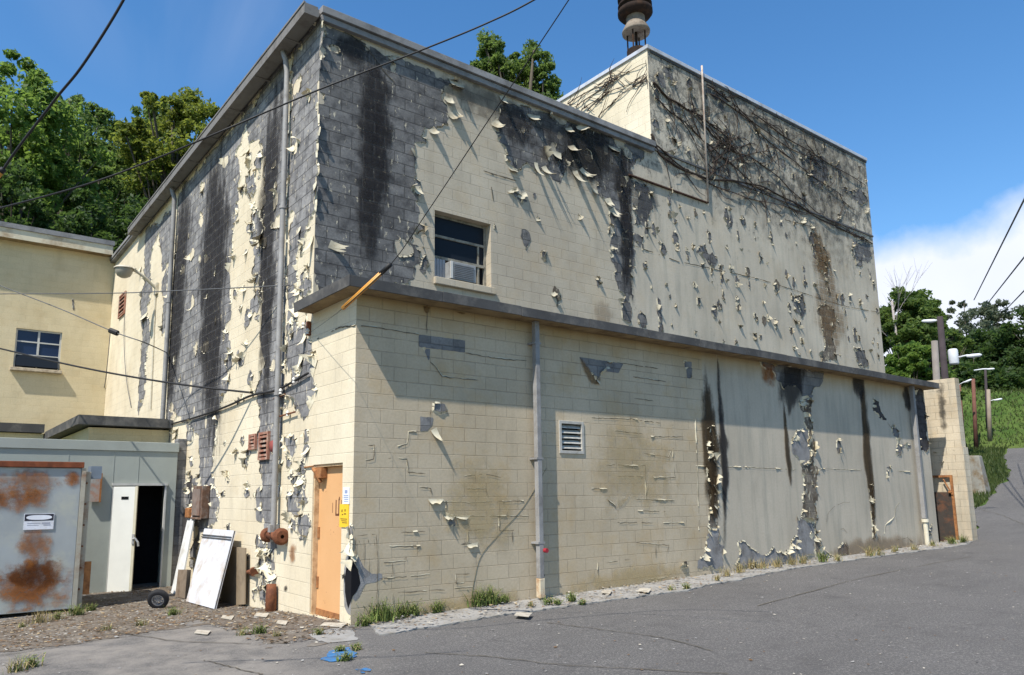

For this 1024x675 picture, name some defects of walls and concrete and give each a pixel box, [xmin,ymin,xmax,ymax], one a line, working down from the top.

water stain [200,176,225,401]
peeling [134,19,470,615]
peeling [491,64,880,571]
corrosion [0,473,48,511]
crack [366,412,525,545]
water stain [862,392,874,517]
peeling [872,388,944,478]
corrosion [0,532,66,613]
crack [355,530,474,606]